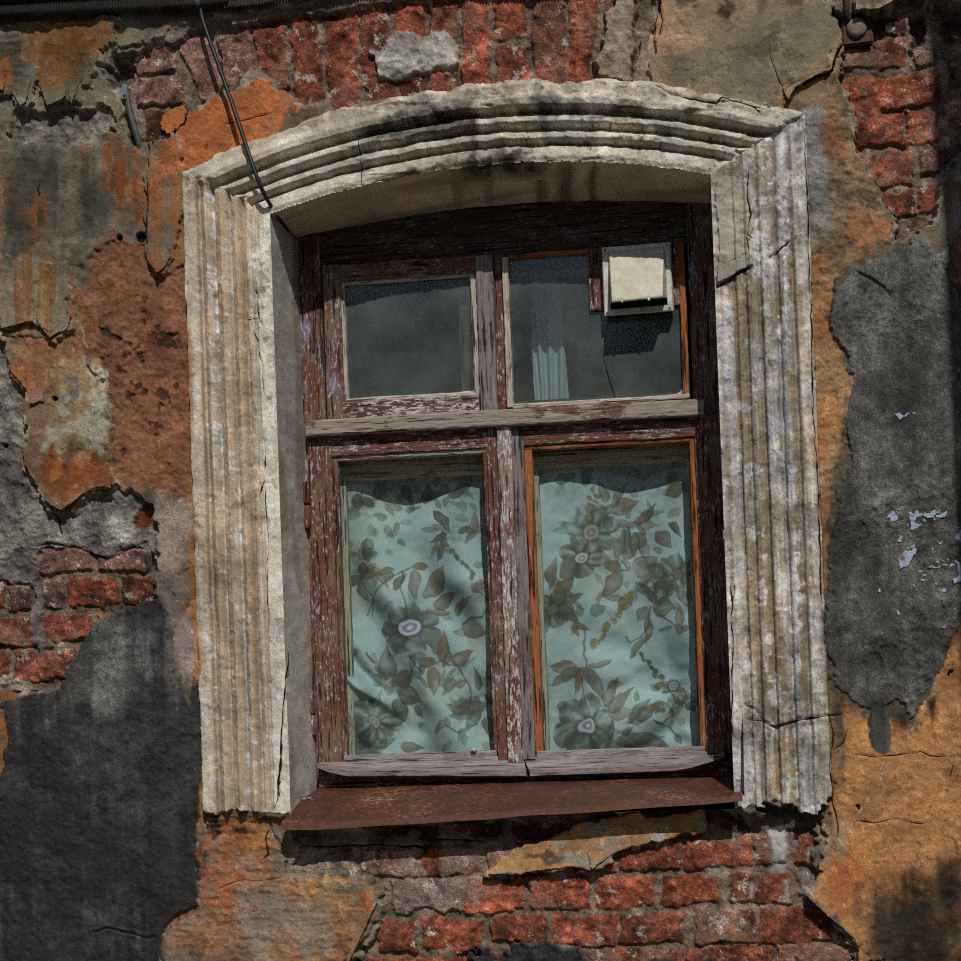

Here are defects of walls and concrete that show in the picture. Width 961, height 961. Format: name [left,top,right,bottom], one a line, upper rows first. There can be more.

spalling [0,0,961,284]
damp [454,119,534,176]
crack [656,44,842,113]
spalling [0,254,160,697]
crack [717,126,826,647]
spalling [162,637,961,961]
crack [730,579,953,836]